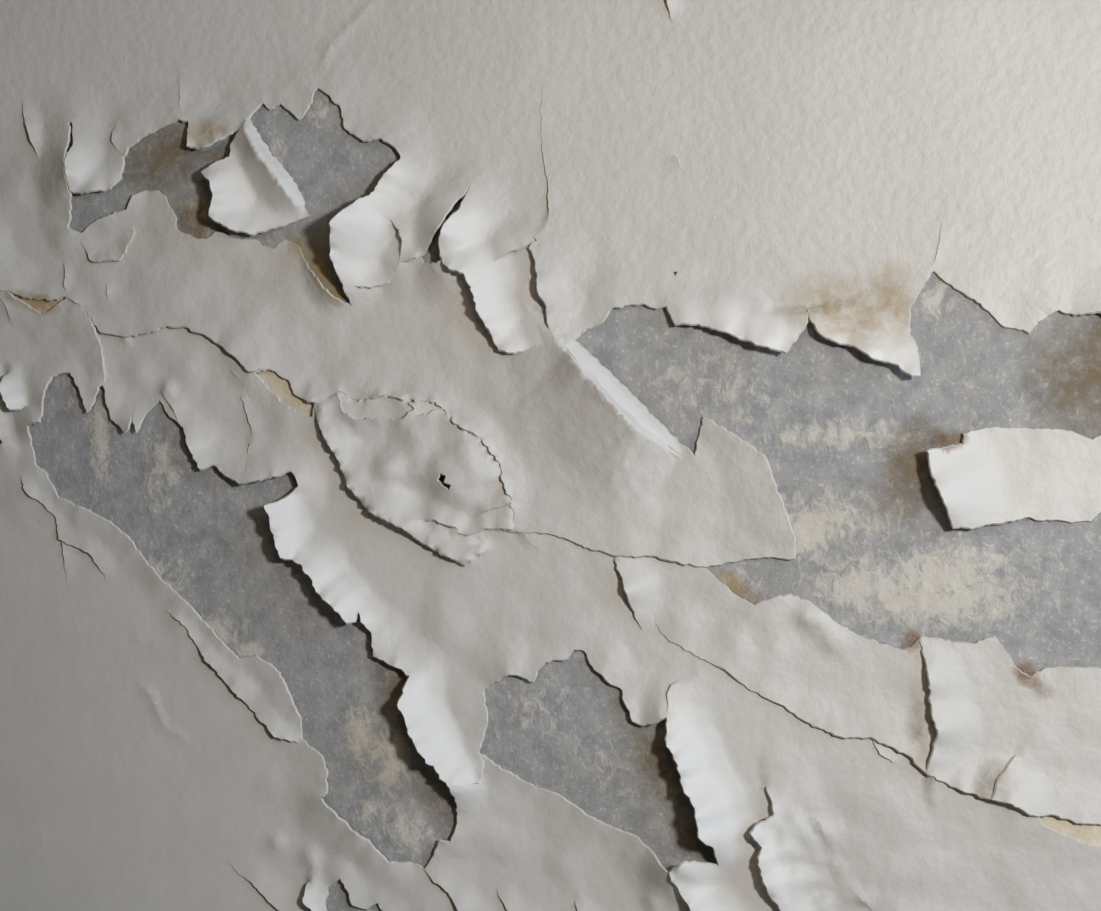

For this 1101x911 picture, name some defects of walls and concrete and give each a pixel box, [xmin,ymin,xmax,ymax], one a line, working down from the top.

peeling [0,357,888,911]
peeling [56,67,1101,690]